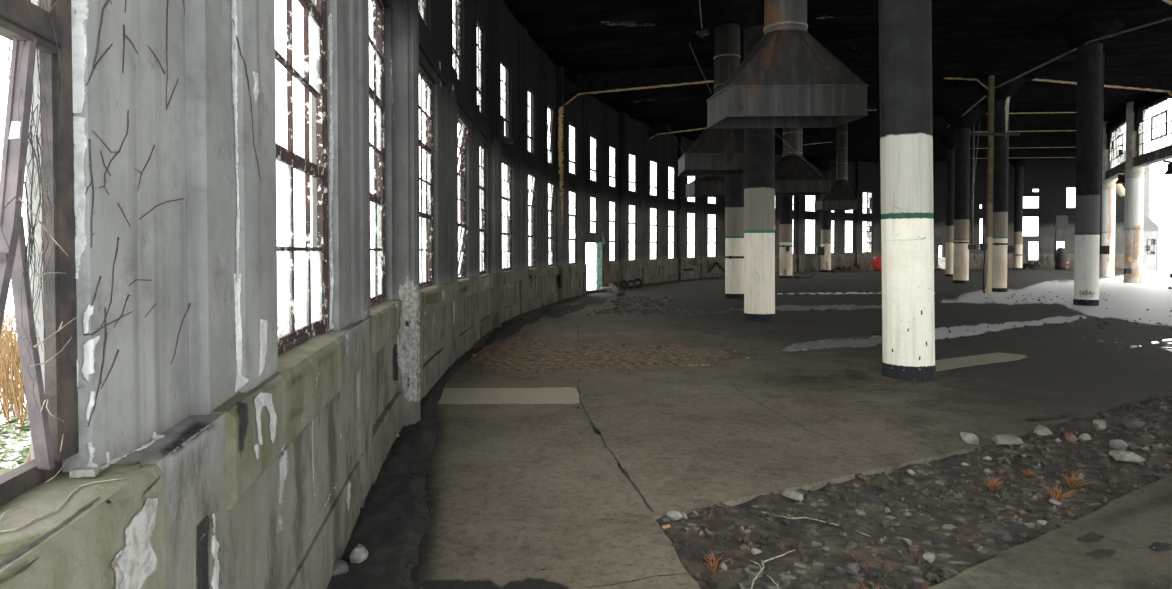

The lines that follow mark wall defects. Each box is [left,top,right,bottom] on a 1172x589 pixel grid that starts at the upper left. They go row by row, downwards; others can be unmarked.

peeling [71,0,89,279]
peeling [231,0,268,392]
peeling [77,305,101,421]
crack [578,386,654,513]
flaking render [111,497,158,589]